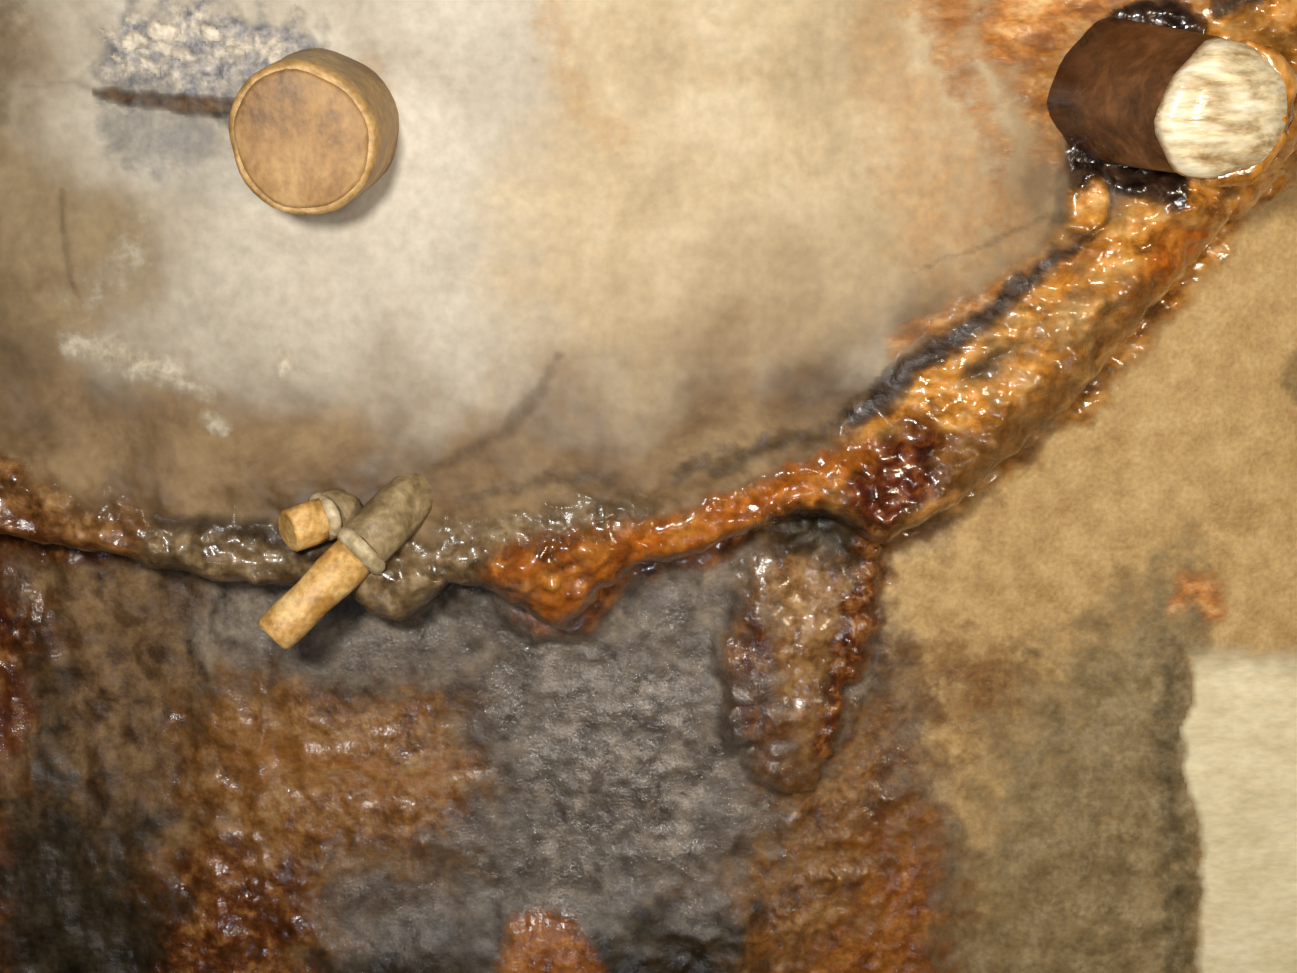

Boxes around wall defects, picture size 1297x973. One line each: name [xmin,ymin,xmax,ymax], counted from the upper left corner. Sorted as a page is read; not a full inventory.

spalling [94,0,326,112]
corrosion [909,0,1202,141]
corrosion [1199,39,1297,187]
damp [66,337,191,387]
damp [0,456,328,589]
corrosion [591,453,868,576]
corrosion [0,600,56,748]
damp [0,806,169,973]
damp [299,503,788,973]
corrosion [500,910,605,973]
corrosion [677,698,980,973]
damp [962,580,1297,973]